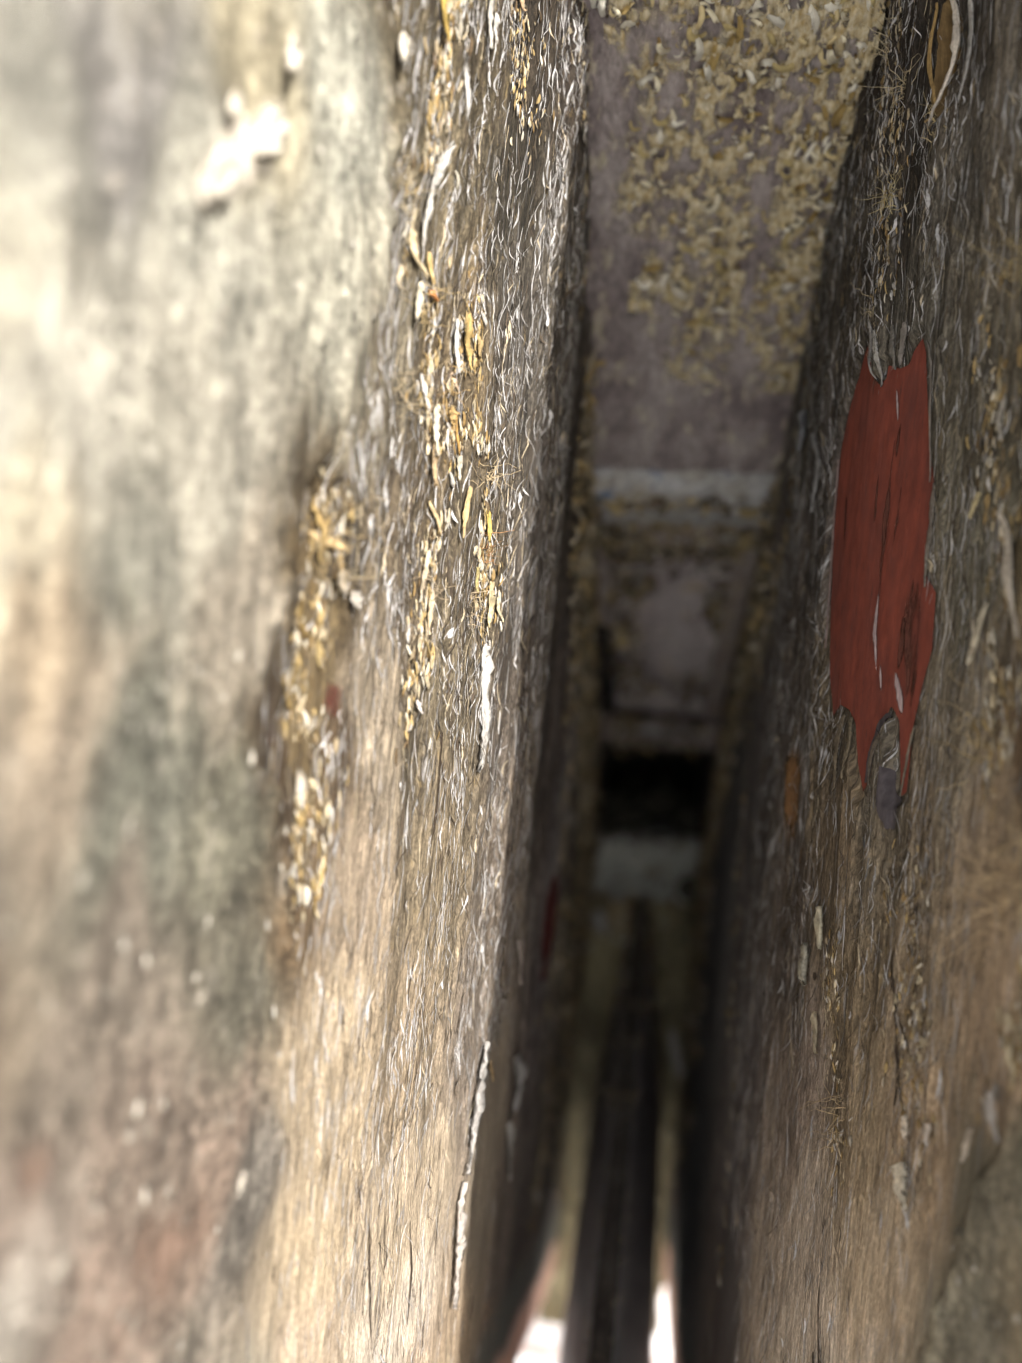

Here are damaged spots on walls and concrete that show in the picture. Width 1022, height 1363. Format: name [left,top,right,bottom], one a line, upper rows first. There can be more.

peeling [278,464,363,940]
peeling [394,0,555,768]
peeling [581,0,936,1132]
peeling [965,252,1022,820]
crack [890,948,910,1149]
peeling [874,842,946,1210]
peeling [961,961,1022,1163]